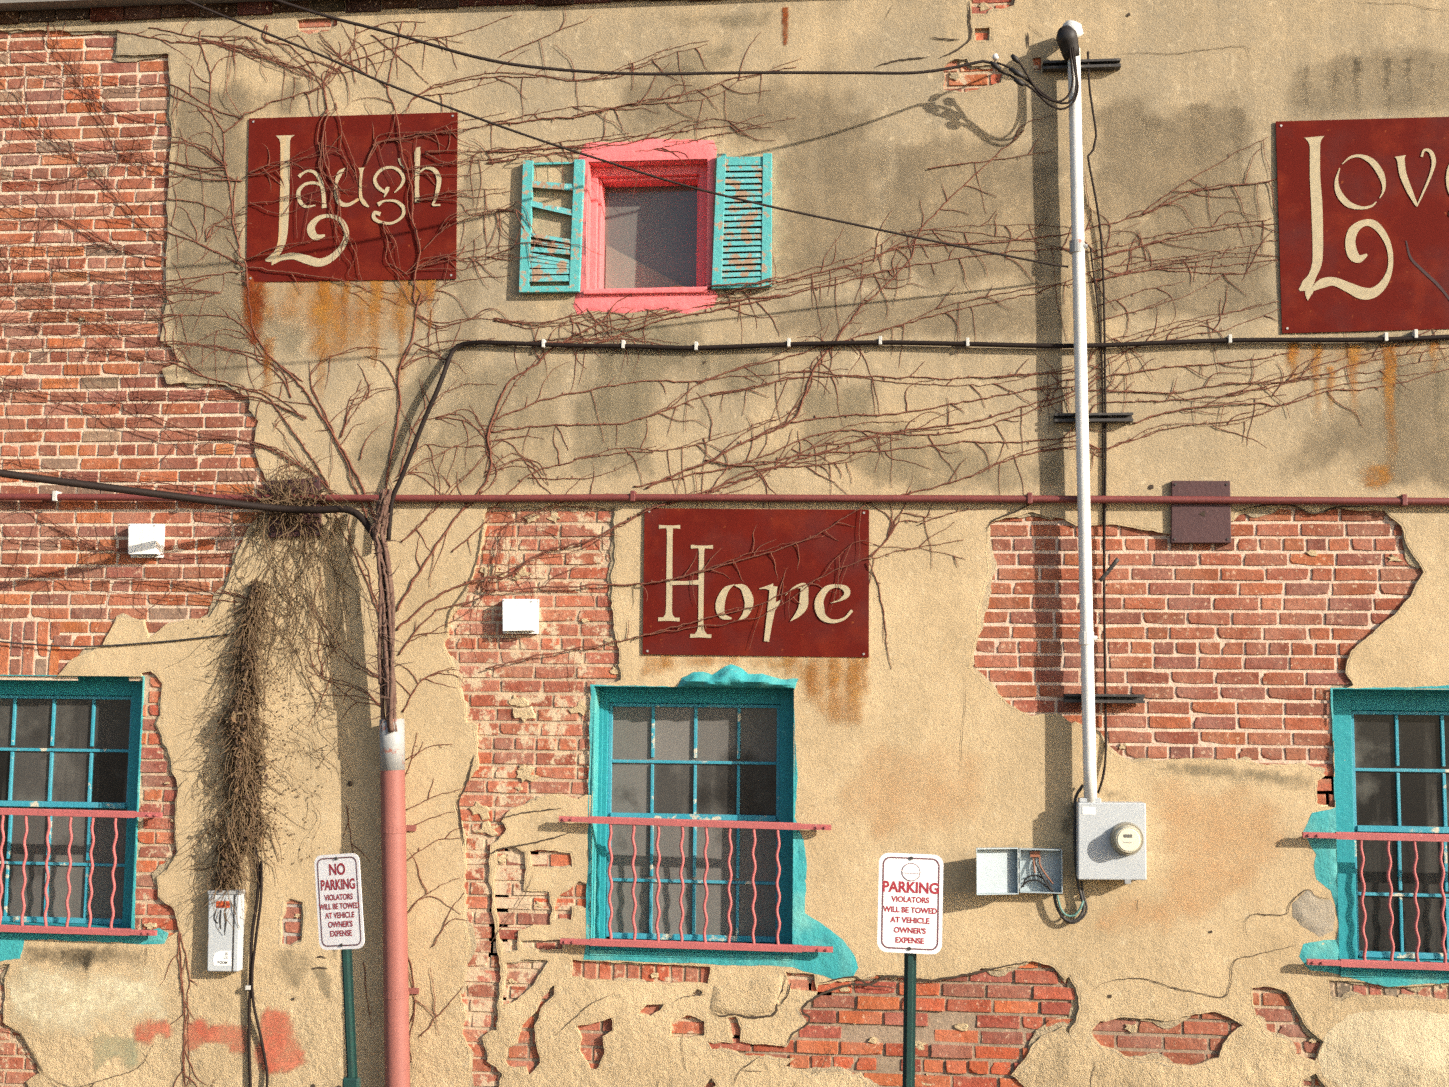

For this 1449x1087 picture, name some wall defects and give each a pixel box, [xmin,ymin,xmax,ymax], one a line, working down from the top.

flaking render [0,27,267,681]
rust [244,274,272,366]
rust [296,280,436,353]
flaking render [969,504,1426,808]
flaking render [443,503,1325,1087]
crack [657,961,1028,1087]
crack [1098,889,1322,998]
flaking render [1327,978,1449,1003]